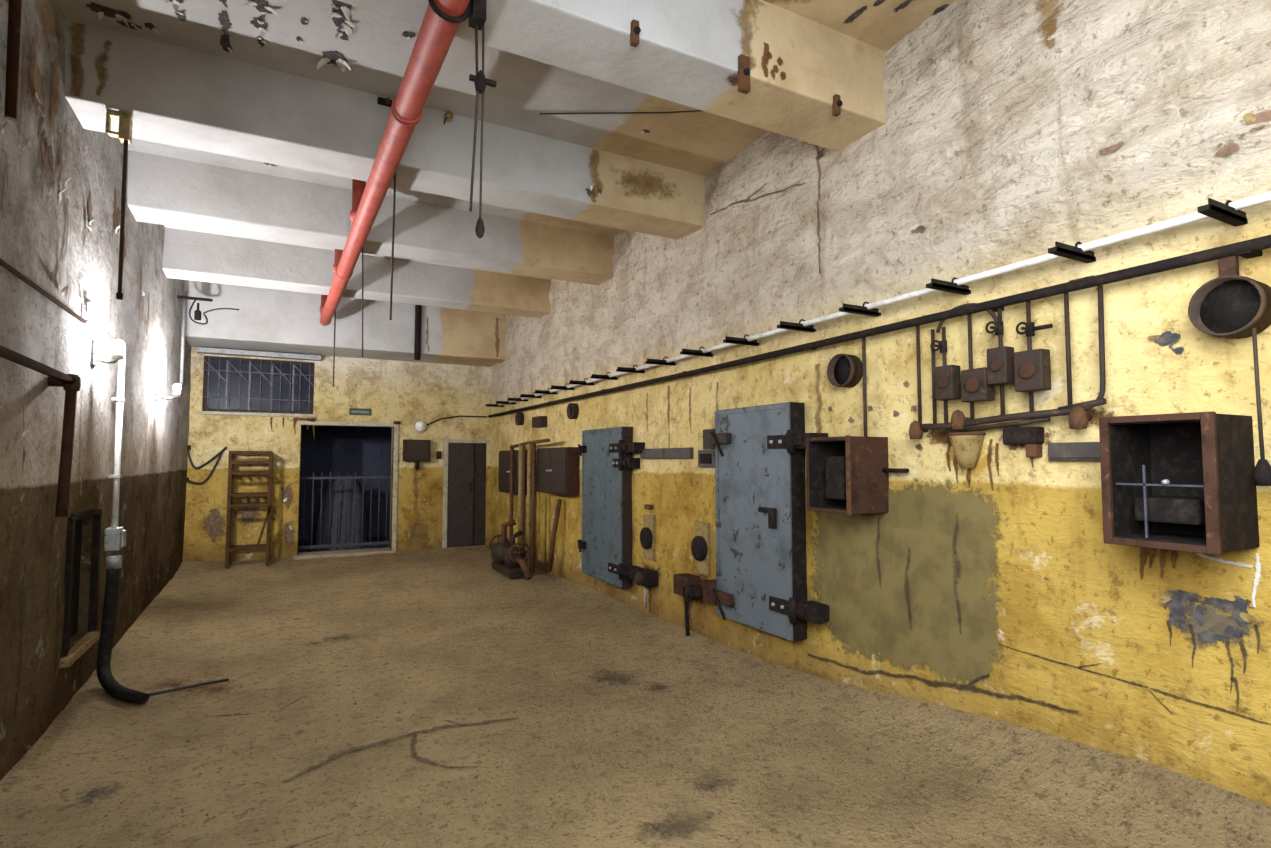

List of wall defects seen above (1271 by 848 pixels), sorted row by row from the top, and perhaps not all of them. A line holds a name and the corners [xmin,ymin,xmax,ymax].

peeling [86,2,159,35]
peeling [166,0,186,22]
peeling [218,0,233,52]
peeling [245,0,278,48]
peeling [317,0,356,72]
leakage [738,0,797,77]
rust [1139,547,1178,580]
crack [808,653,1079,713]
crack [998,644,1270,724]
crack [282,718,518,782]